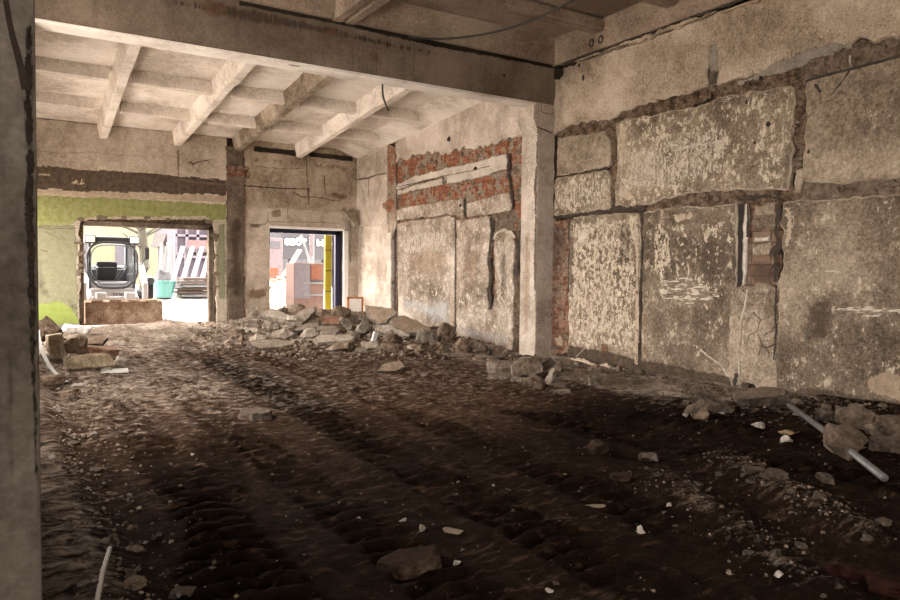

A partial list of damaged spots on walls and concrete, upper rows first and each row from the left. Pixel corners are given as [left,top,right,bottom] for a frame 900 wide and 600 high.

peeling [24,25,250,482]
flaking render [382,137,522,343]
peeling [550,38,900,365]
crack [700,104,782,386]
peeling [867,372,900,401]